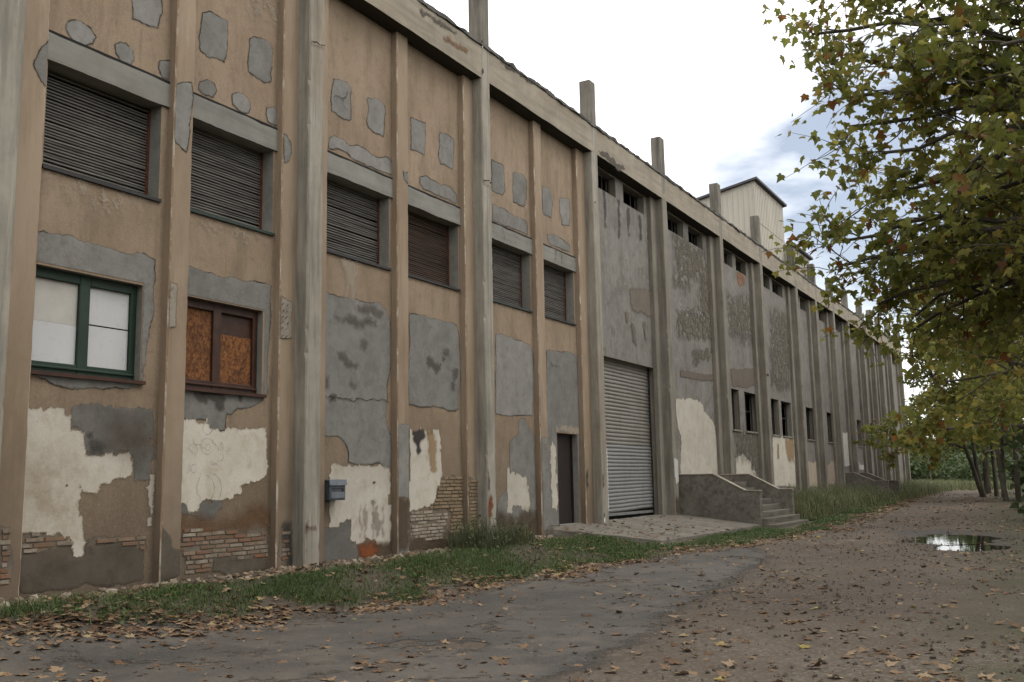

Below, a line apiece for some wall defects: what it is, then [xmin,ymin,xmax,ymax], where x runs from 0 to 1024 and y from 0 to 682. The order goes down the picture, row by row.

peeling [0,406,156,585]
peeling [181,418,269,514]
peeling [329,463,392,545]
peeling [409,426,478,541]
peeling [507,467,530,514]
peeling [674,398,718,484]
peeling [772,436,796,487]
flaking render [180,526,291,574]